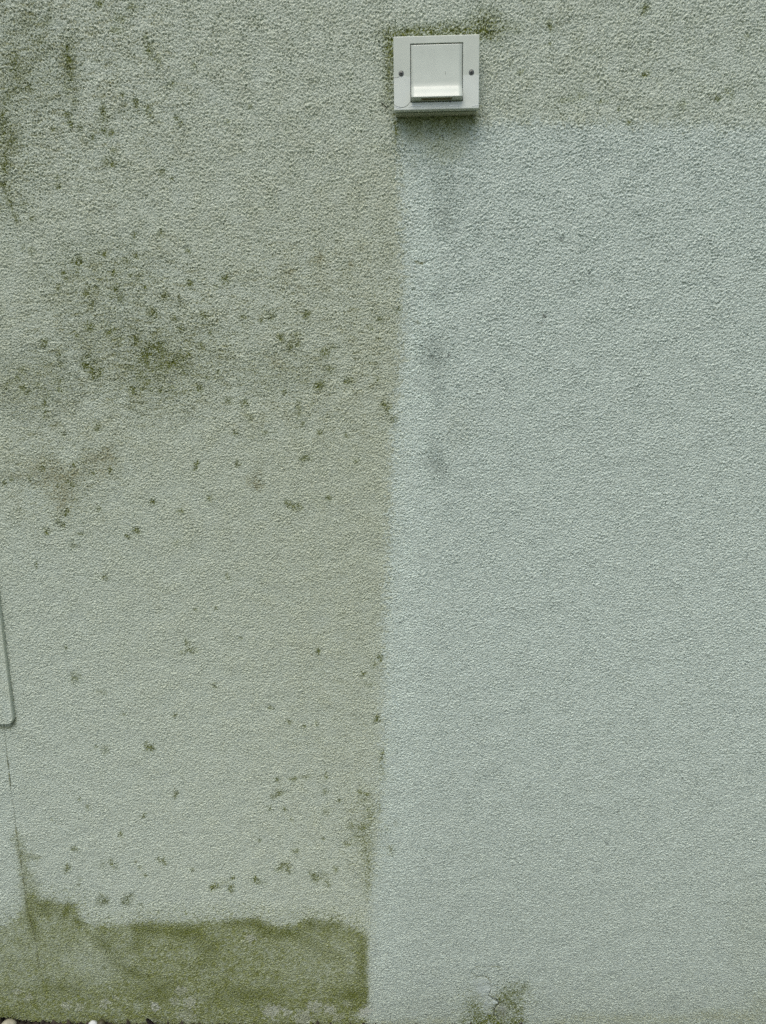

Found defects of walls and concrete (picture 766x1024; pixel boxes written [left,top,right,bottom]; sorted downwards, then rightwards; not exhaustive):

leakage [59,33,79,113]
leakage [0,104,37,227]
leakage [0,441,125,525]
leakage [8,826,47,927]
leakage [340,747,402,905]